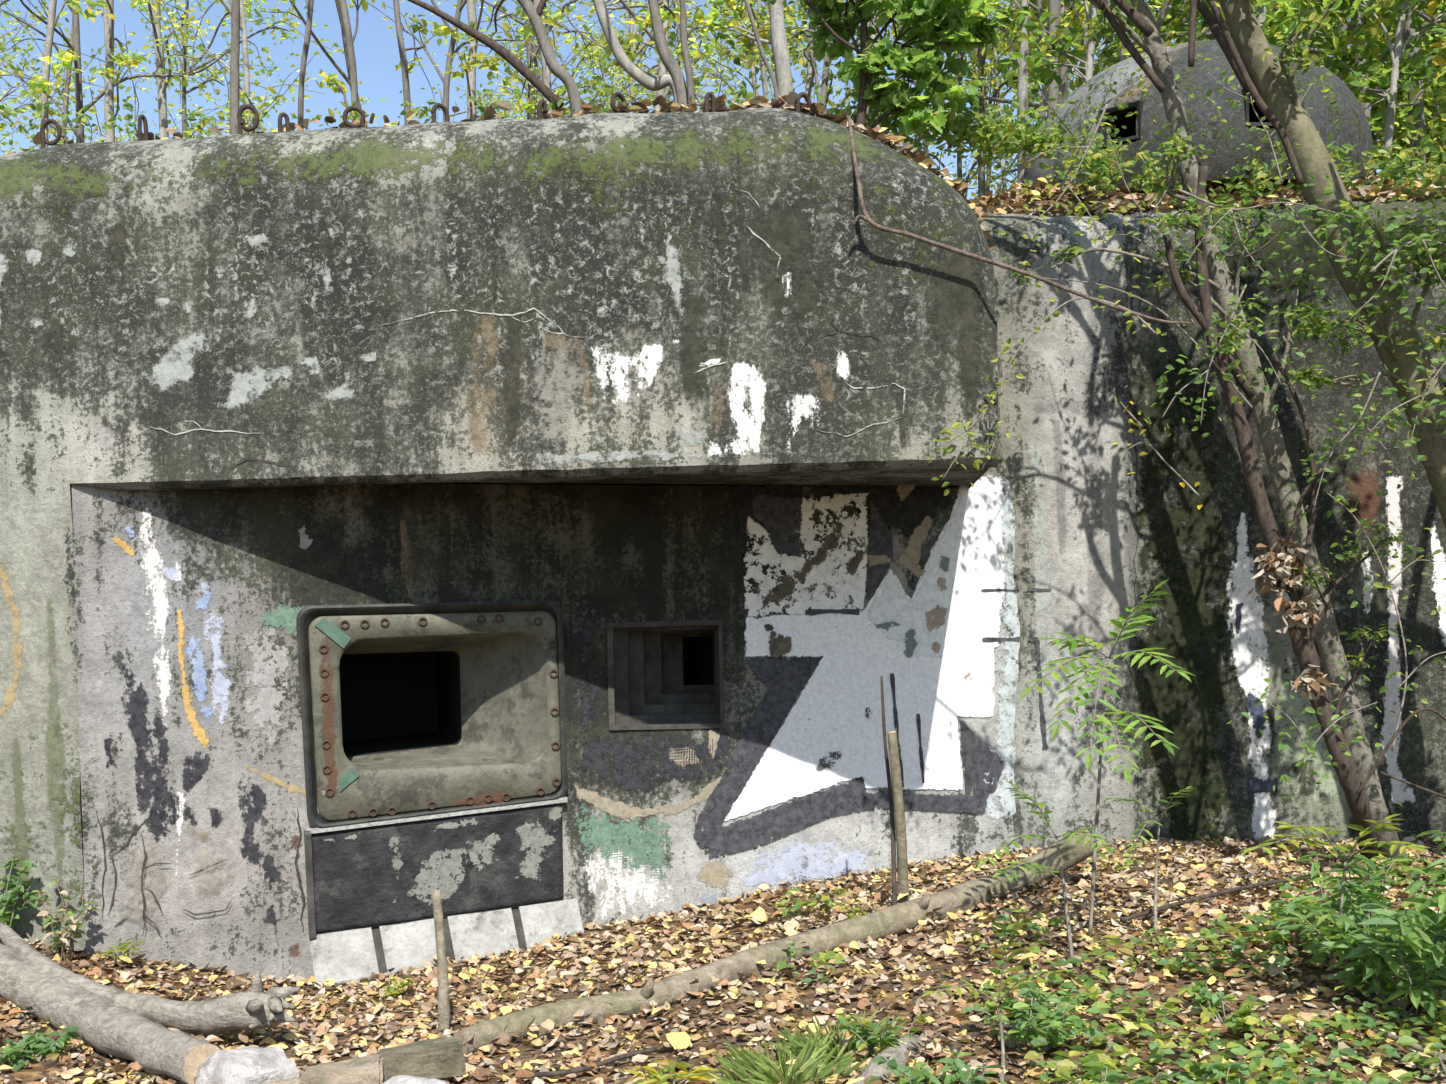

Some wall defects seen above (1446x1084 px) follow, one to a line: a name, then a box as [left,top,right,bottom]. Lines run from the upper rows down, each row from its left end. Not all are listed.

damp [714,151,833,326]
crack [152,420,286,467]
crack [378,307,579,337]
peeling [534,335,766,464]
damp [679,289,727,408]
peeling [786,394,819,448]
damp [1027,443,1052,705]
rust [319,636,338,797]
crack [96,810,231,935]
crack [290,807,306,932]
peeling [389,818,500,905]
peeling [515,730,740,883]